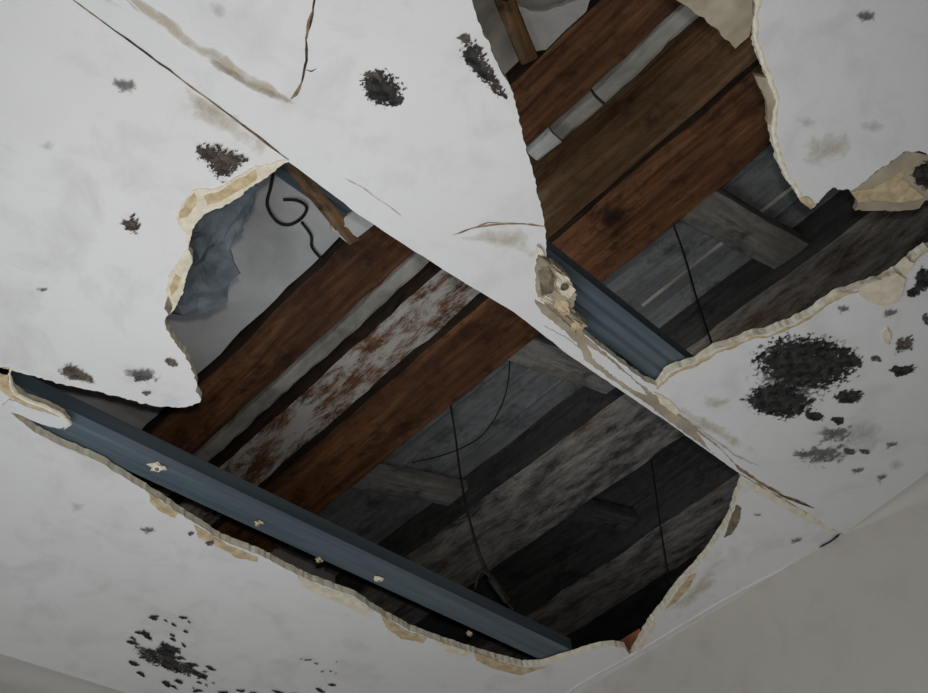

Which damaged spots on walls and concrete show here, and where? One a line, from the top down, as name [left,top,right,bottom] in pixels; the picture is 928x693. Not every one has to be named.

crack [73,0,289,160]
crack [291,0,316,99]
damp [359,68,406,109]
damp [456,33,507,99]
damp [196,143,248,183]
peeling [852,168,924,202]
peeling [858,257,914,306]
damp [739,332,916,463]
damp [126,616,256,693]